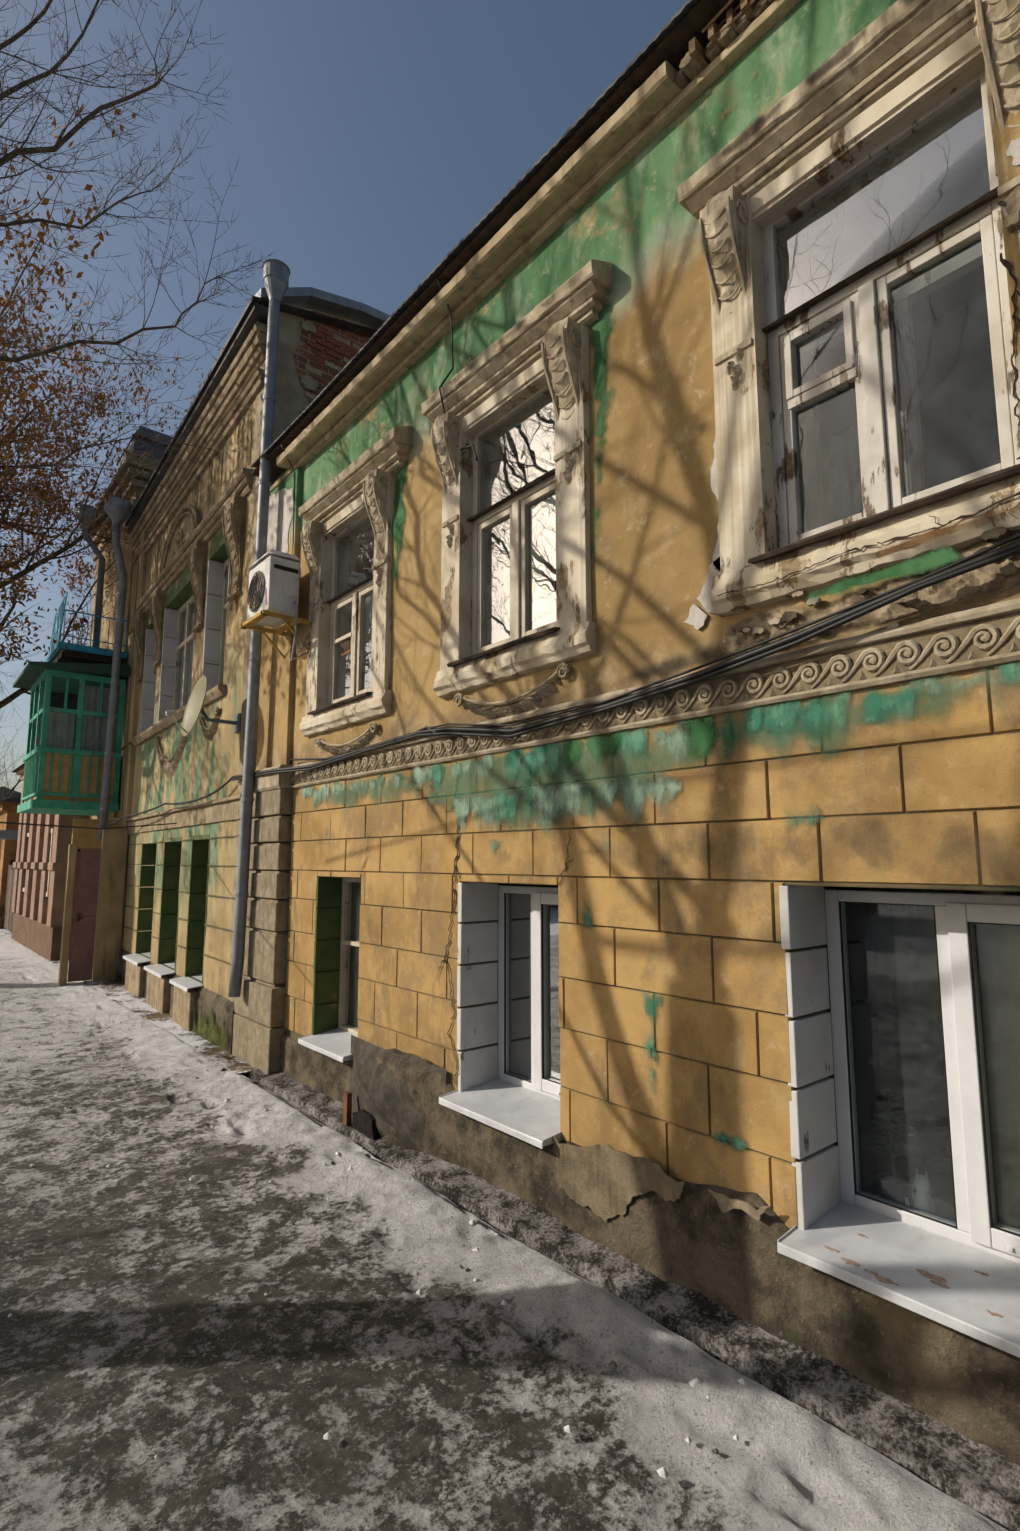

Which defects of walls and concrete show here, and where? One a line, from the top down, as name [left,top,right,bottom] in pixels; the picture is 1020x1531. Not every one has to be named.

peeling [1006,137,1020,166]
spalling [1001,186,1020,247]
spalling [293,311,370,415]
peeling [685,523,721,630]
spalling [722,526,1020,656]
peeling [302,662,1020,828]
peeling [644,993,662,1078]
peeling [714,1132,745,1151]